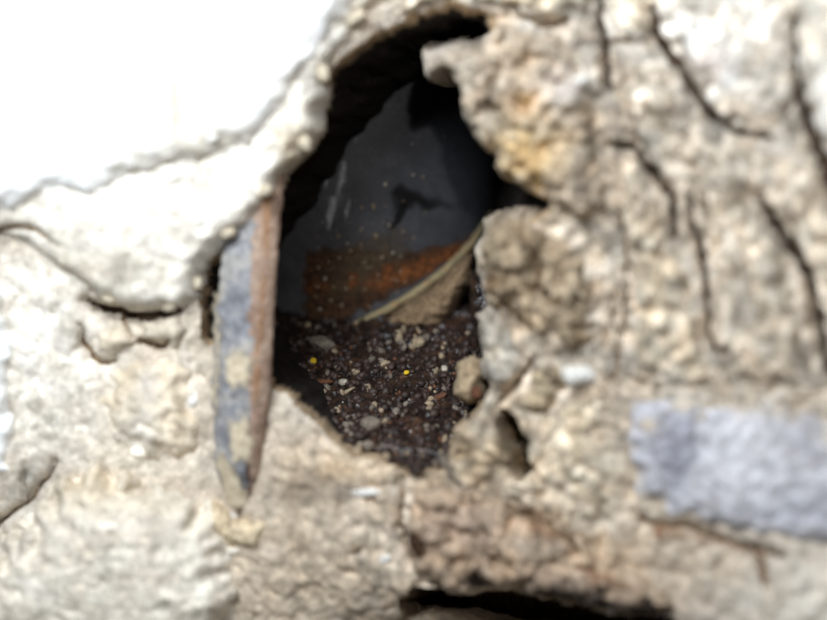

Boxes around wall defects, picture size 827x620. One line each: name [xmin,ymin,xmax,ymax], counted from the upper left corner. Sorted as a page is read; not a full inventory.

rust [242,172,286,497]
peeling [0,0,606,480]
spalling [351,488,381,497]
rust [302,235,473,322]
spalling [517,365,613,503]
spalling [596,0,827,392]
crack [597,0,827,385]